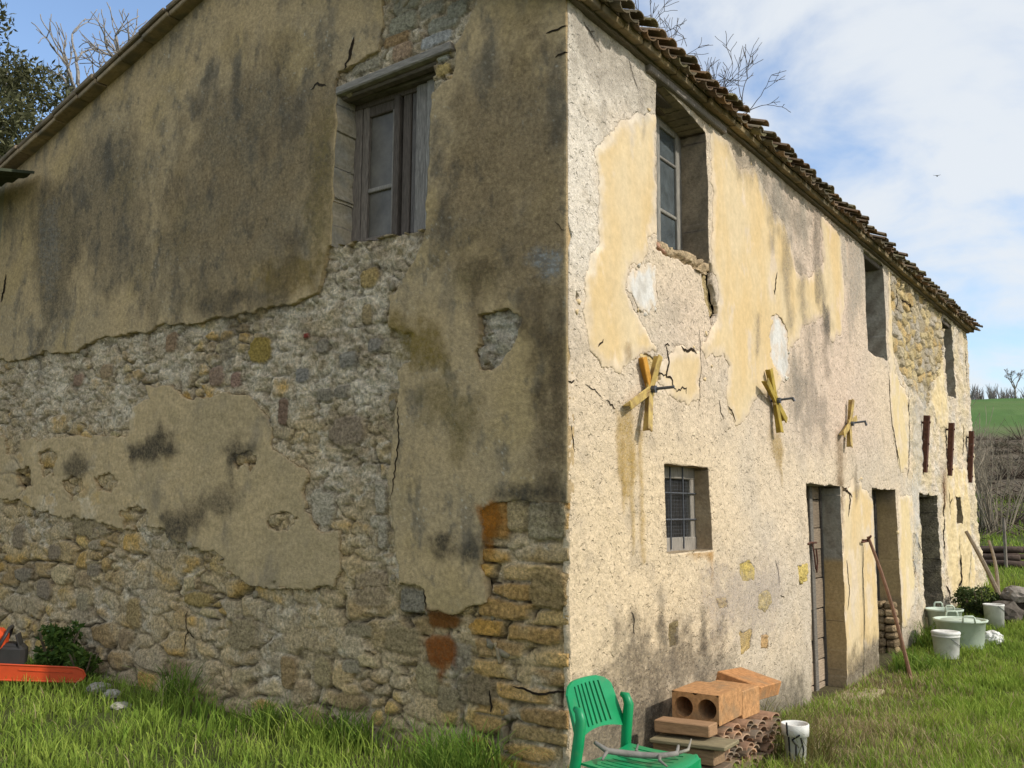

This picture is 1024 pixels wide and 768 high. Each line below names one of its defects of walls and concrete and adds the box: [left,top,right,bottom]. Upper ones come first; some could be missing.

crack [311,37,354,90]
peeling [575,108,845,426]
crack [658,331,736,421]
spalling [887,267,951,474]
leakage [129,427,173,460]
crack [390,407,400,496]
spalling [0,231,570,768]
corrosion [426,612,459,677]
crack [489,686,565,715]